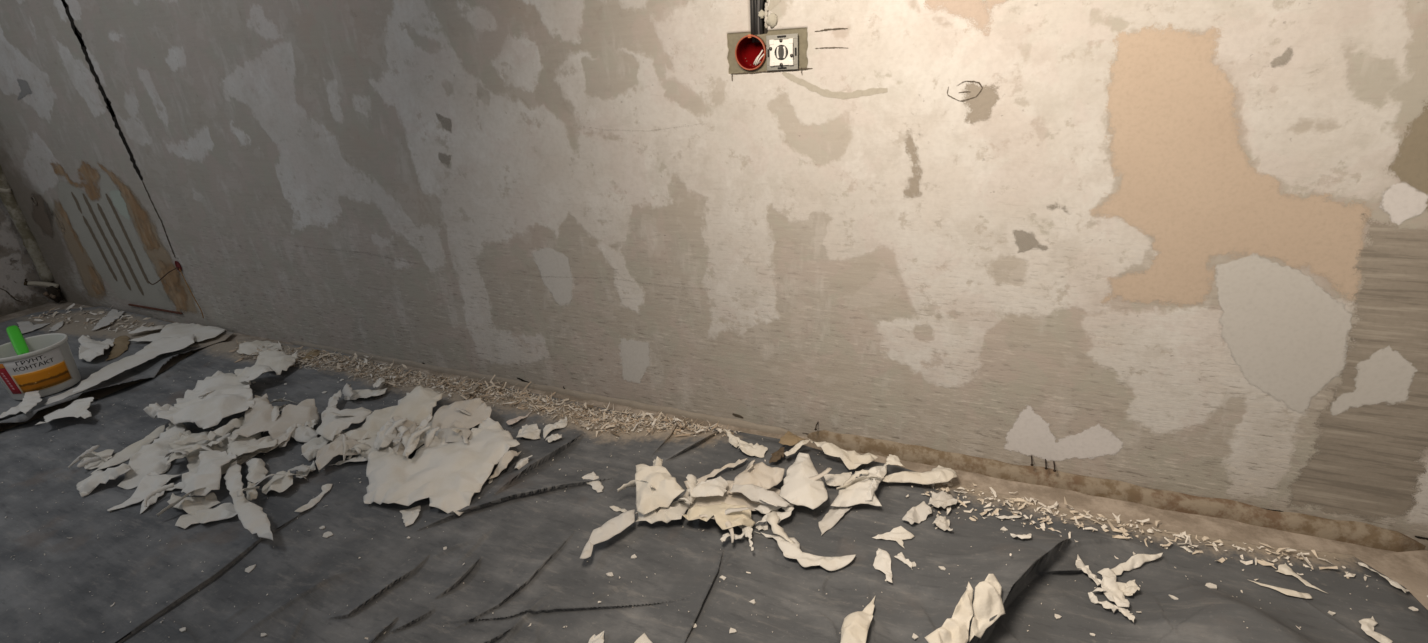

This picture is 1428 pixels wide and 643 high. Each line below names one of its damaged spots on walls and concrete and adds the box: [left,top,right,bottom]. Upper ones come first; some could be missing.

peeling [923,0,1010,36]
spalling [1268,48,1292,70]
crack [61,0,175,257]
spalling [43,286,63,303]
peeling [1287,100,1428,524]